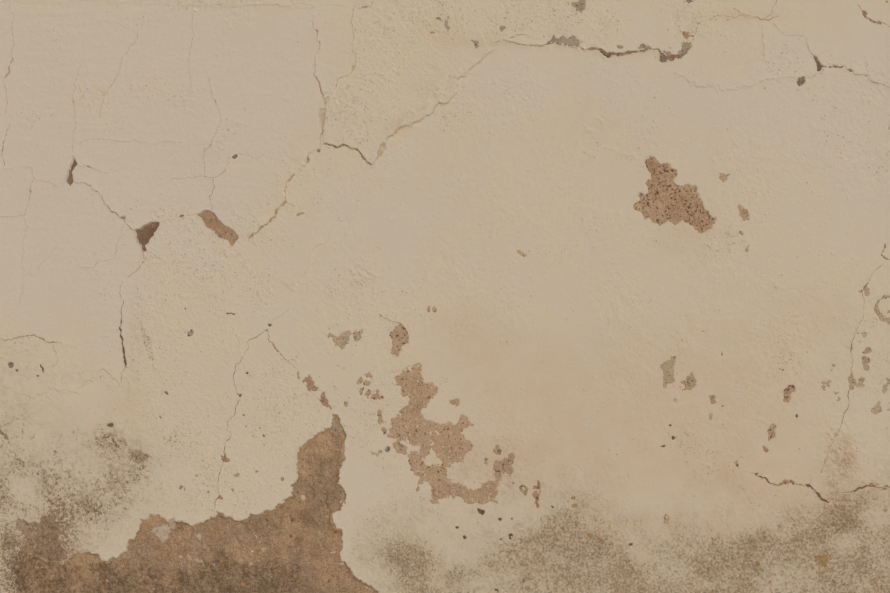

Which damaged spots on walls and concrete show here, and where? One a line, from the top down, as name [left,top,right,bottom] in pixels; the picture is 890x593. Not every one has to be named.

damp [0,403,152,593]
crack [1,3,174,298]
crack [119,254,162,398]
spalling [135,223,159,252]
flaking render [13,372,378,593]
spalling [197,211,239,246]
crack [214,307,296,504]
peeling [357,363,542,521]
crack [248,0,822,241]
damp [366,486,890,593]
peeling [633,156,716,234]
crack [747,244,890,504]